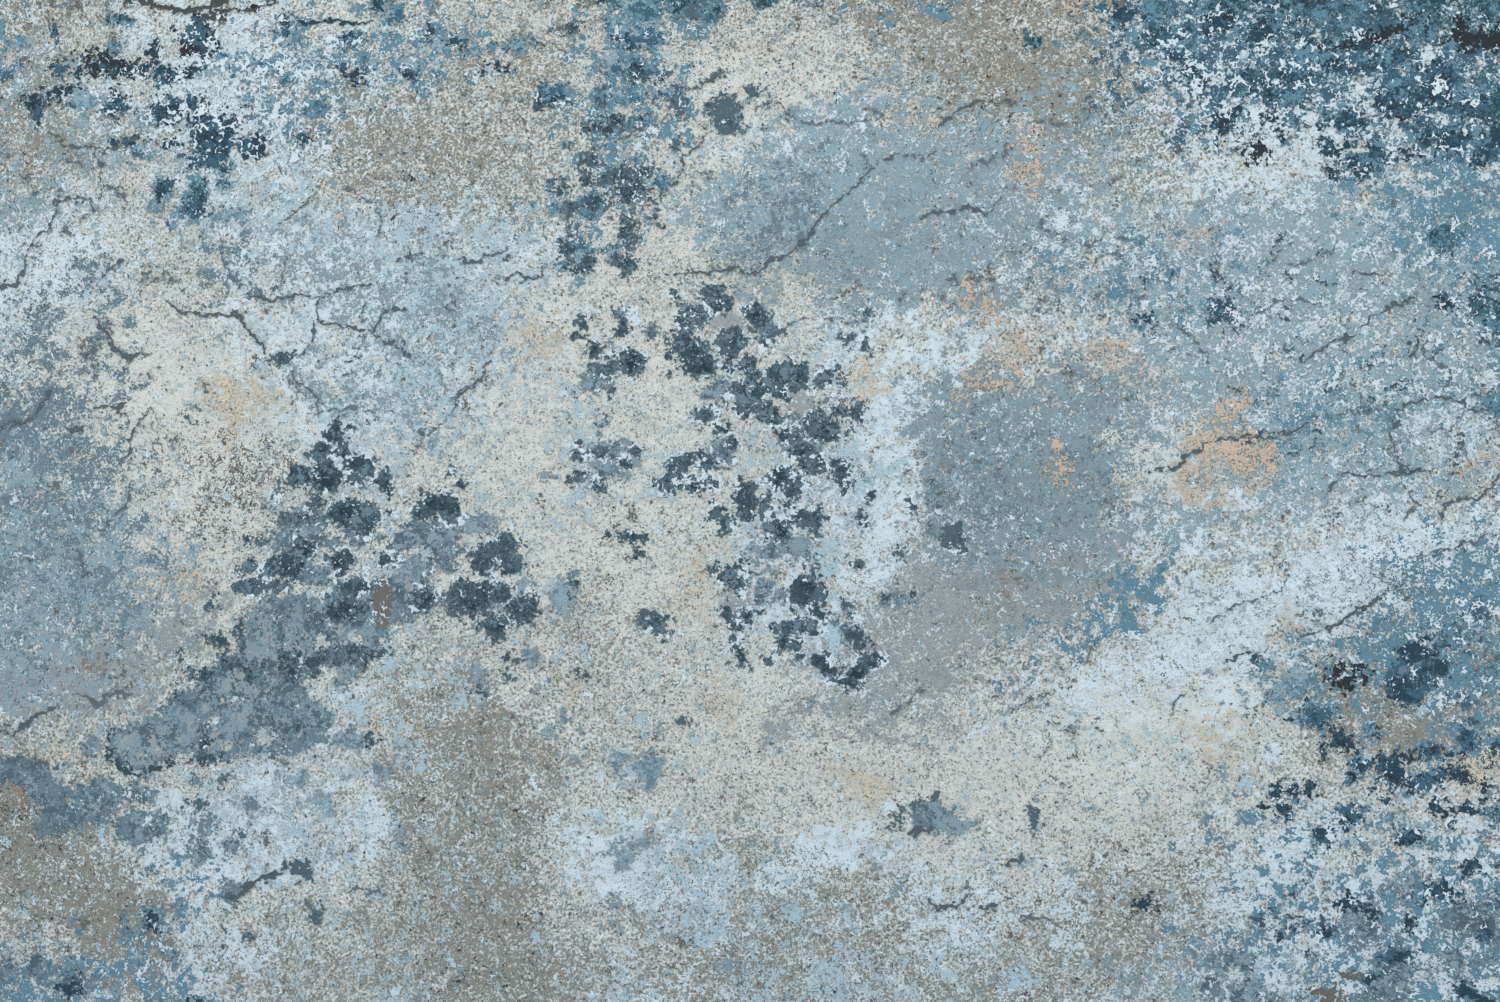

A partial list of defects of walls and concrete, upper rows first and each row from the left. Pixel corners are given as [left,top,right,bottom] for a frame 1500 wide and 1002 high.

crack [1073,28,1126,75]
crack [0,131,172,289]
crack [616,69,1500,638]
rust [1170,384,1290,523]
crack [889,687,930,715]
crack [1168,651,1263,723]
crack [1413,615,1497,688]